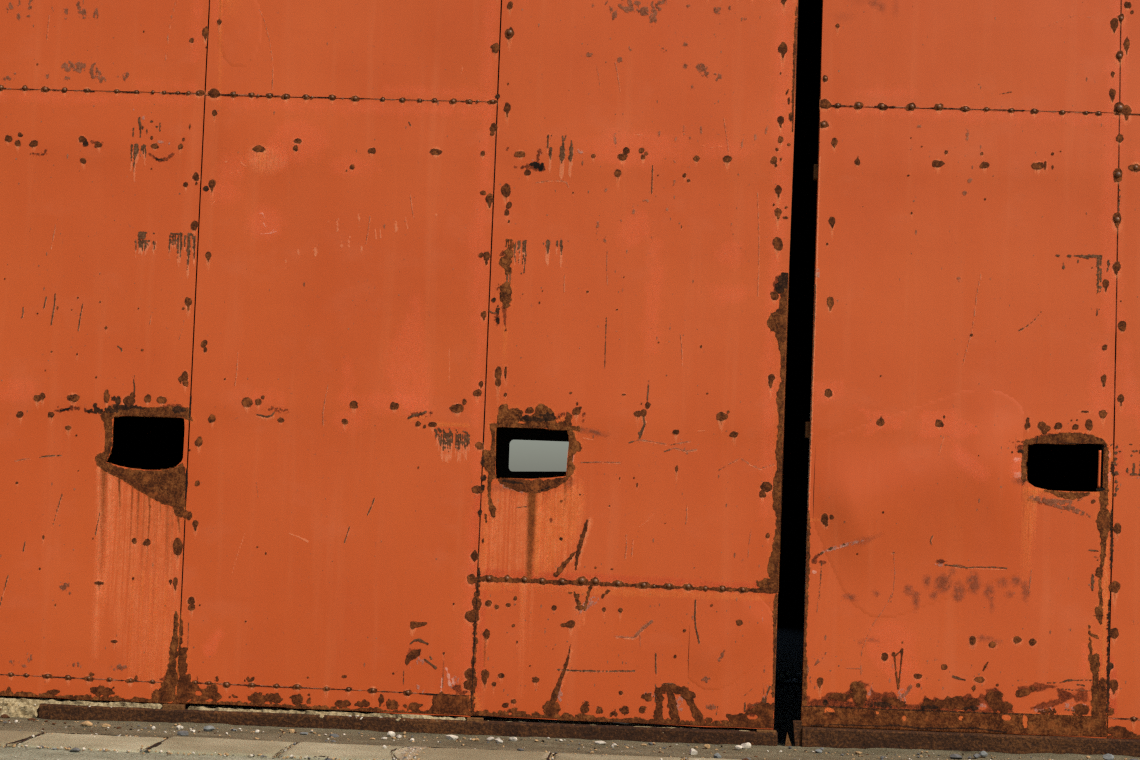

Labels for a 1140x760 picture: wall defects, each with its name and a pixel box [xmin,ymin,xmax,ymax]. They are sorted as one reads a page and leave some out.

corrosion [0,272,788,728]
corrosion [801,269,1140,739]